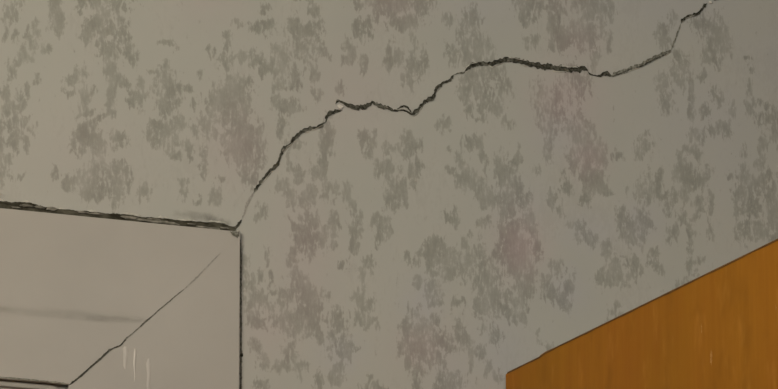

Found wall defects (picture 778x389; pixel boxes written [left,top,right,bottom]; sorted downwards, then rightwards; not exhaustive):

crack [69,254,220,385]
crack [233,1,712,389]